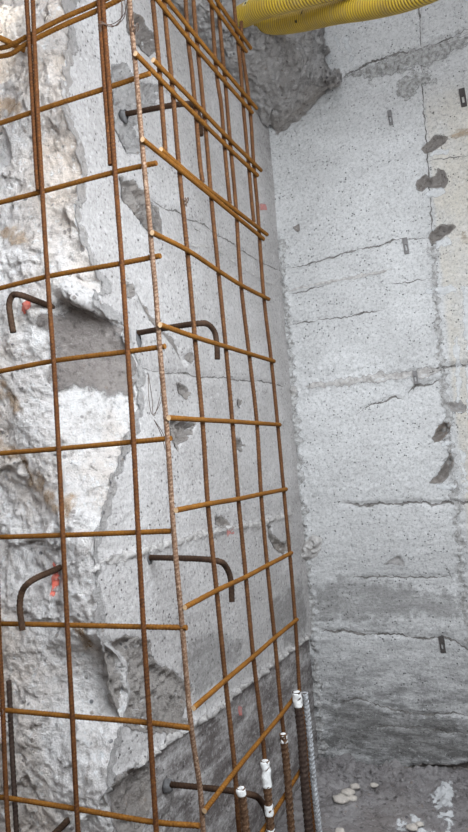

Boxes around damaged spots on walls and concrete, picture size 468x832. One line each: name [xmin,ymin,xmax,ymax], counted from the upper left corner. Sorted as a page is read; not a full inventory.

crack [152,8,468,271]
spalling [421,135,449,156]
spalling [416,168,448,197]
spalling [428,224,456,249]
crack [359,364,468,413]
spalling [0,0,302,832]
damp [397,814,434,832]
damp [431,781,457,832]